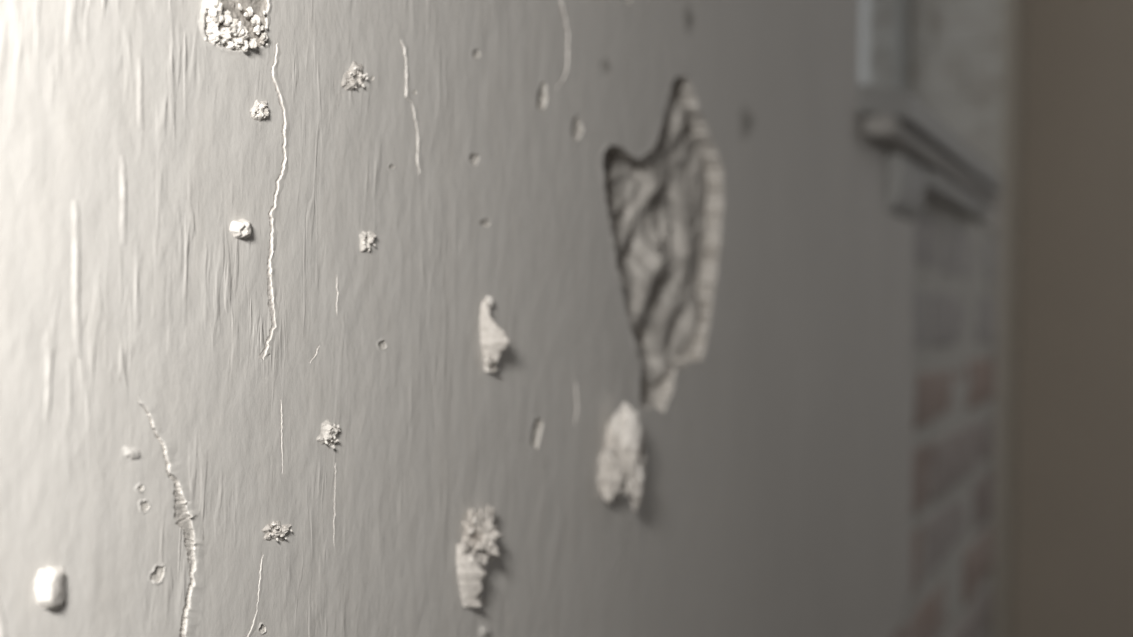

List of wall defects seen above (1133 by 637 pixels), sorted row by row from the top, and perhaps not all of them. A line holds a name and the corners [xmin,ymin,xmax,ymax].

flaking render [198,0,273,55]
flaking render [341,61,374,91]
crack [400,39,423,174]
crack [555,0,571,91]
crack [258,43,290,360]
flaking render [599,73,726,417]
peeling [480,296,510,373]
crack [137,394,208,637]
crack [247,555,264,637]
peeling [456,504,502,607]